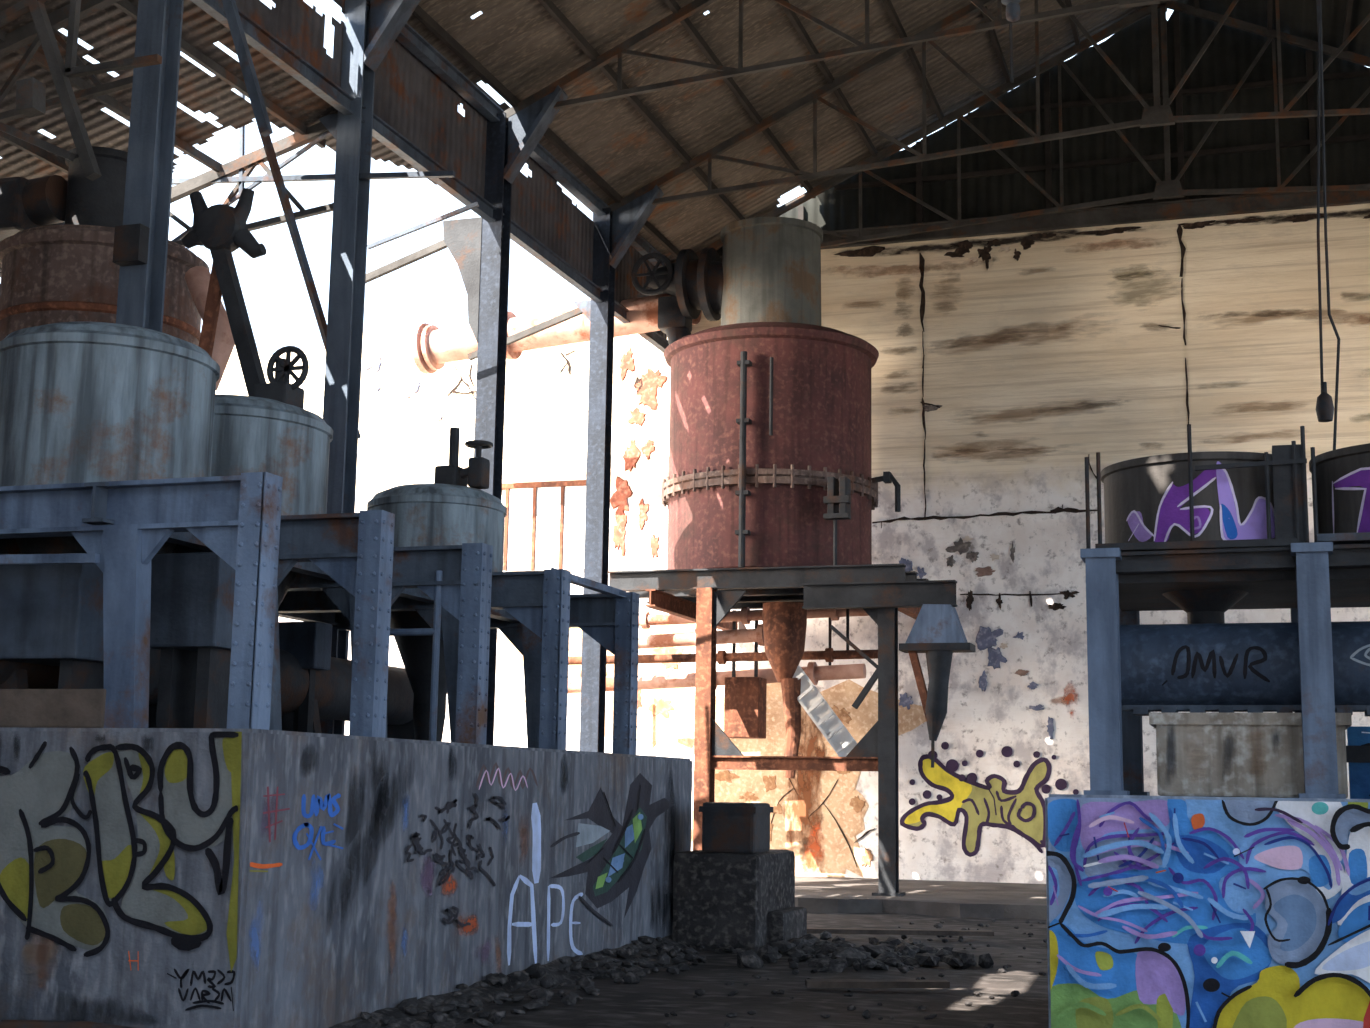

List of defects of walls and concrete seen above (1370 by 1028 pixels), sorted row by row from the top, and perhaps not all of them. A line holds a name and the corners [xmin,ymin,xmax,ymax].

crack [1158,225,1190,424]
peeling [610,347,668,558]
spalling [899,558,927,579]
spalling [945,536,1015,577]
peeling [714,680,878,878]
corrosion [785,718,825,870]
peeling [898,692,926,736]
spalling [975,626,1054,739]